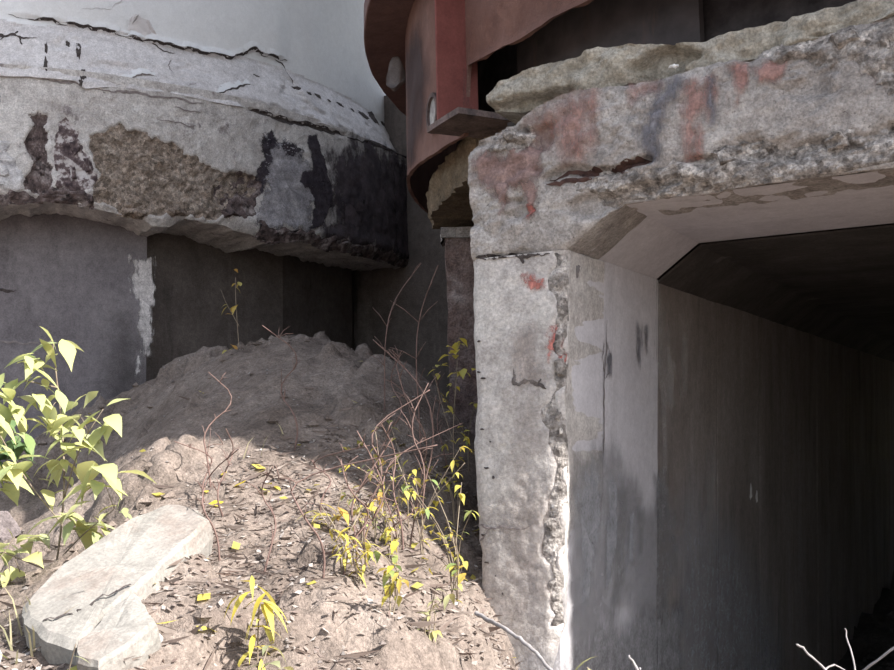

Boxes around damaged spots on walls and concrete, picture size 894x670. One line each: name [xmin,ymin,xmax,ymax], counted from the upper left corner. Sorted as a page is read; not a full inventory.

crack [0,31,35,44]
spalling [761,16,894,96]
spalling [0,117,409,268]
spalling [250,109,406,158]
spalling [575,126,894,209]
spalling [541,253,580,626]